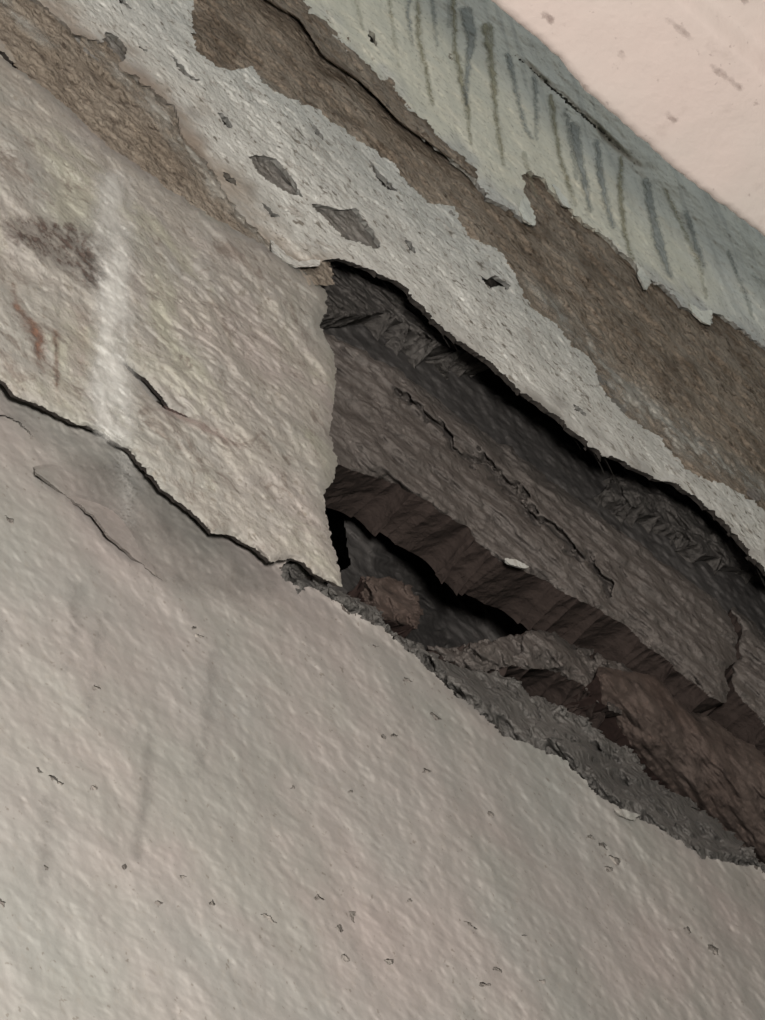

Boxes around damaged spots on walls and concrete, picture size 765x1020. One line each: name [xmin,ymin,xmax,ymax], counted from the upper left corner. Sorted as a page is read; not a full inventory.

flaking render [0,0,334,286]
water stain [406,0,436,101]
water stain [451,0,503,155]
flaking render [191,0,765,510]
water stain [506,53,634,259]
water stain [643,178,671,277]
water stain [665,189,704,270]
spalling [280,259,765,873]